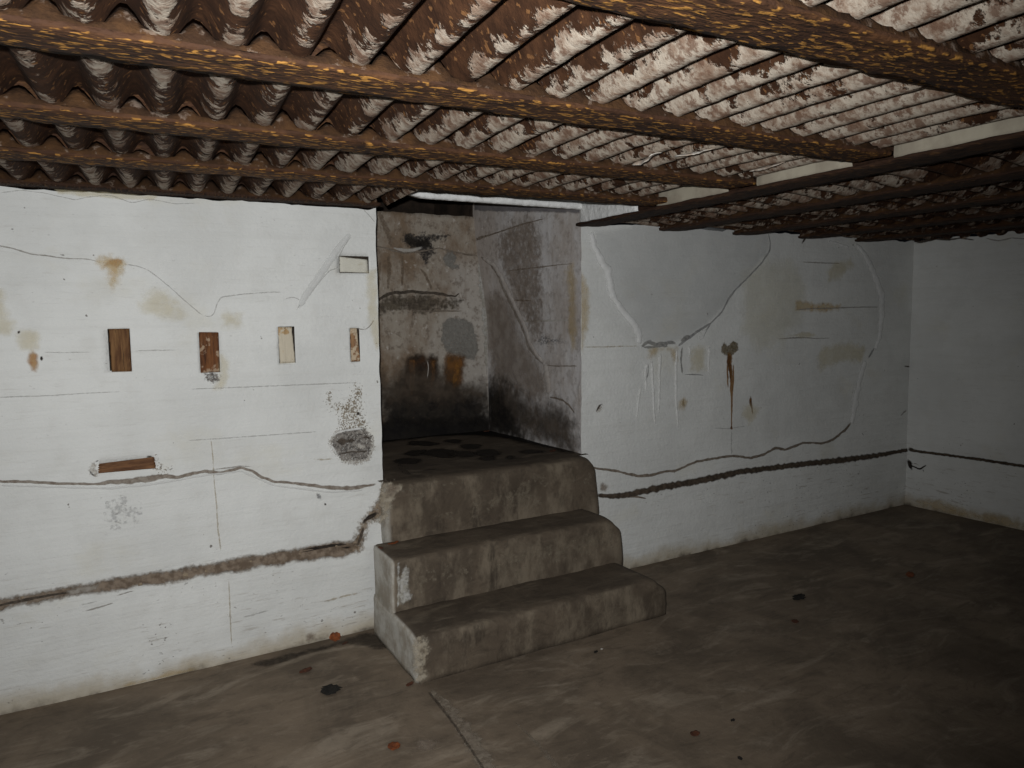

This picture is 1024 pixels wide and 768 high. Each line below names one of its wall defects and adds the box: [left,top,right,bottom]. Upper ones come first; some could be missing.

crack [0,245,90,260]
leakage [107,260,122,274]
leakage [404,232,449,288]
leakage [381,367,574,464]
rust [721,341,738,429]
crack [0,466,374,493]
crack [594,423,1024,499]
crack [0,541,355,611]